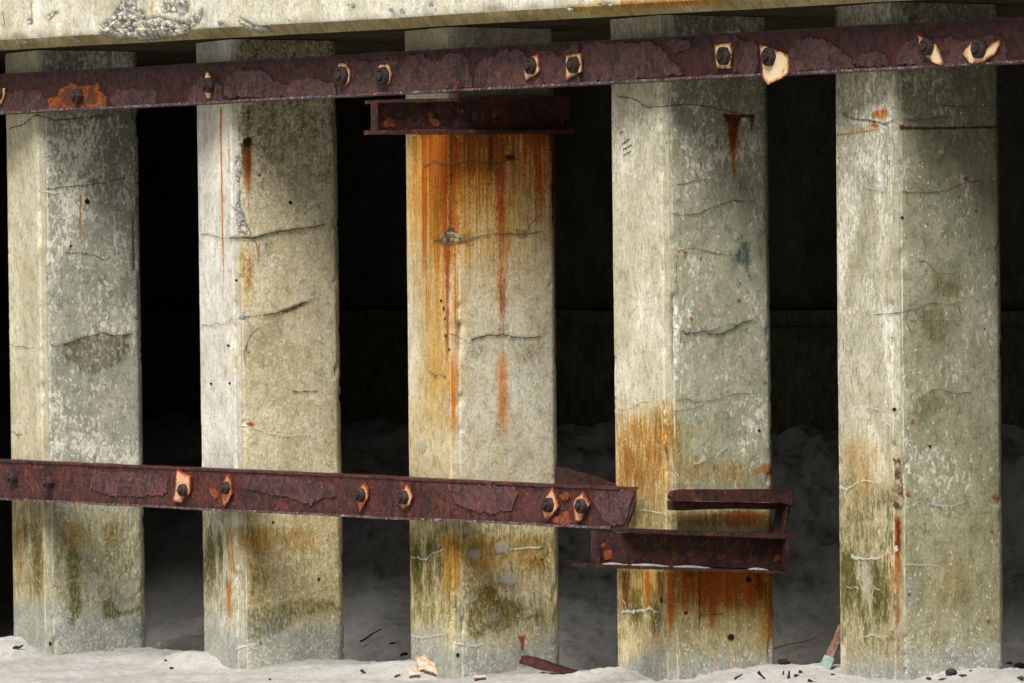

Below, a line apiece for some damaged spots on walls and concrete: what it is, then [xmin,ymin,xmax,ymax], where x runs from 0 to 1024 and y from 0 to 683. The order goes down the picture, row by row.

spalling [98,0,203,42]
rust [390,52,474,92]
rust [713,34,759,74]
rust [788,36,856,72]
rust [896,34,1008,67]
rust [82,470,168,497]
rust [551,492,571,525]
rust [593,489,634,526]